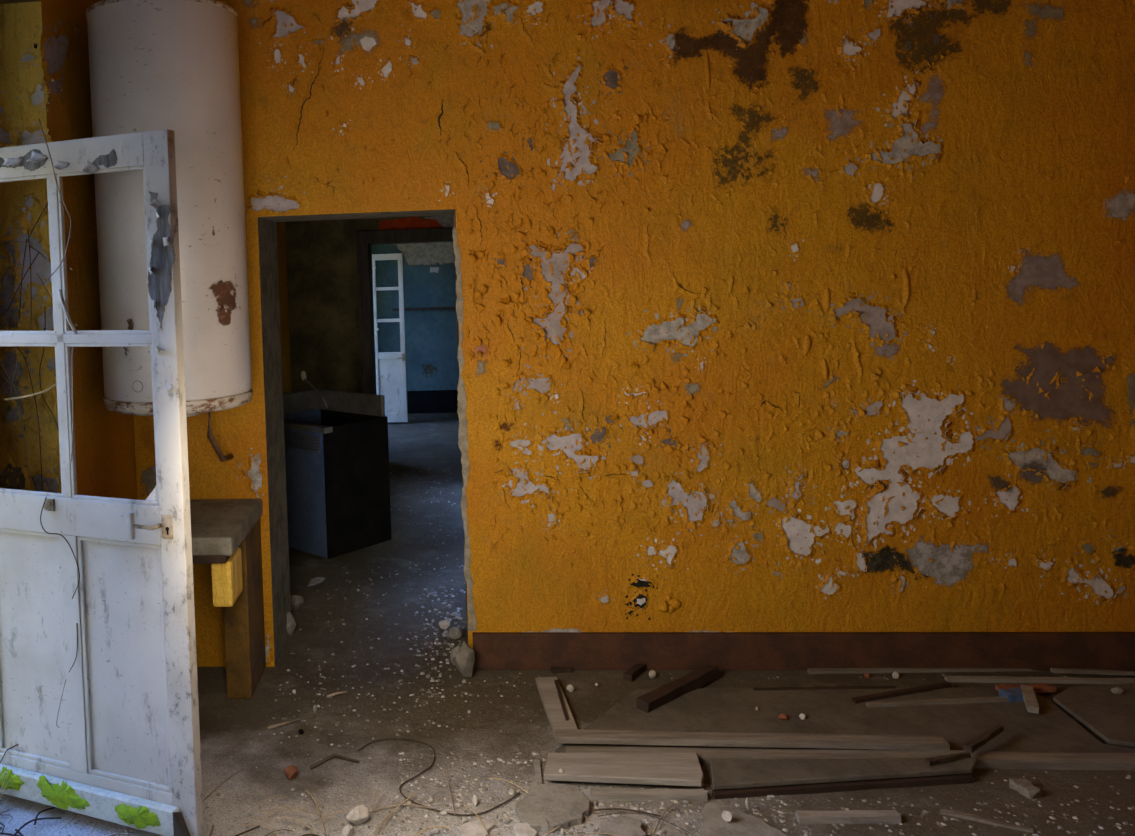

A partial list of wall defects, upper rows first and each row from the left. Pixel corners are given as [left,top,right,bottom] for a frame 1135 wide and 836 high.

peeling [0,15,117,175]
crack [285,11,340,196]
peeling [480,52,652,207]
peeling [577,0,643,40]
leakage [669,0,821,187]
leakage [884,0,1010,74]
peeling [0,186,54,331]
peeling [0,346,62,493]
peeling [488,226,1135,620]